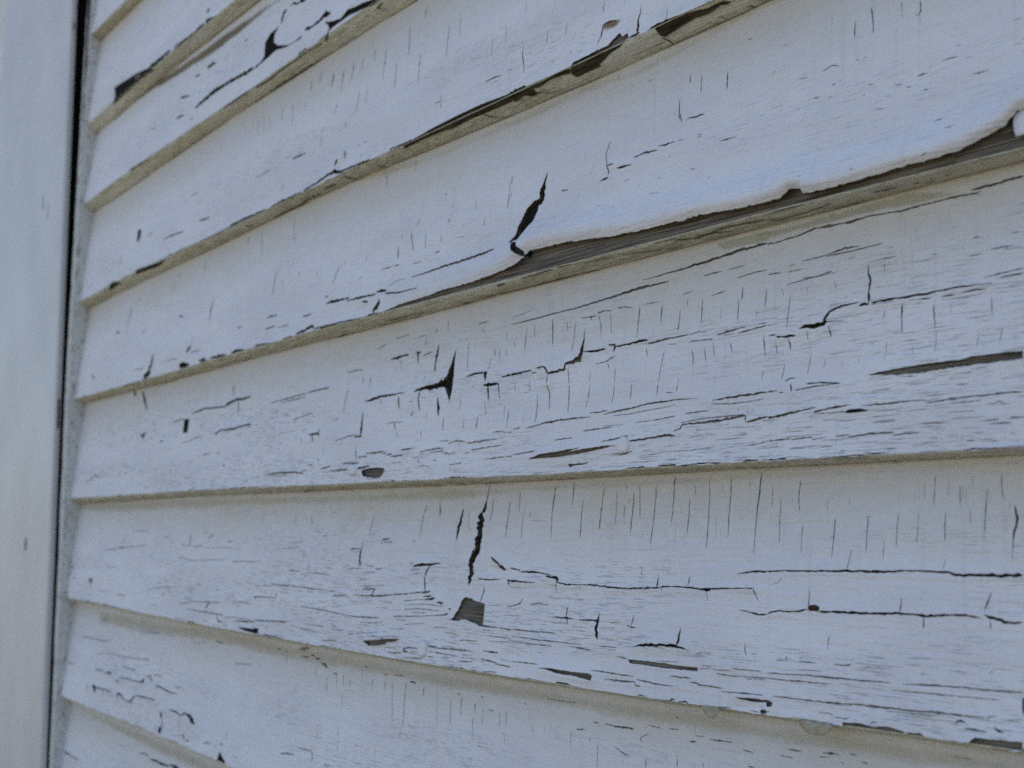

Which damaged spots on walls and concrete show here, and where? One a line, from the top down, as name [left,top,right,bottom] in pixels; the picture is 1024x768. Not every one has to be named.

spalling [113,68,153,104]
spalling [265,32,287,60]
spalling [306,0,383,41]
peeling [1002,109,1024,137]
crack [464,173,954,304]
peeling [596,153,956,252]
crack [200,267,423,362]
peeling [388,281,481,311]
crack [345,300,703,427]
crack [738,267,1002,393]
crack [471,453,1023,629]
crack [555,616,685,649]